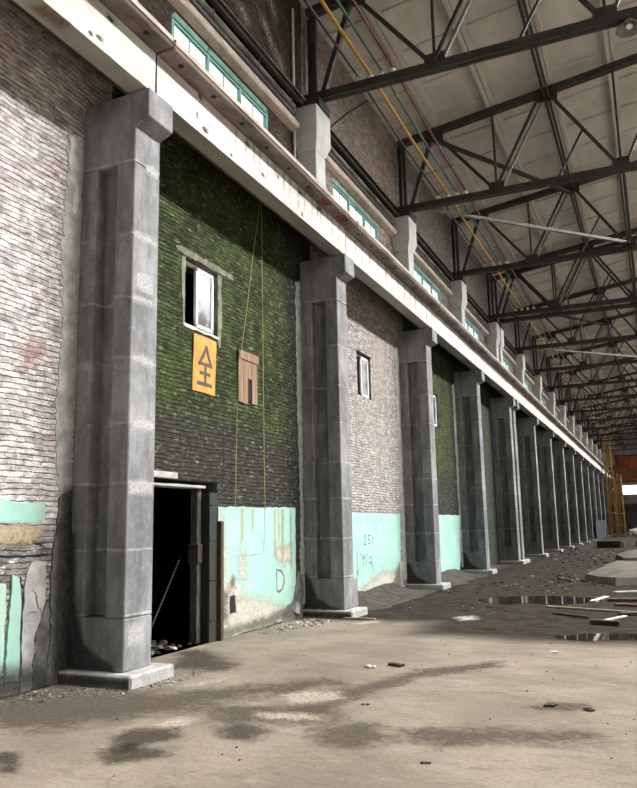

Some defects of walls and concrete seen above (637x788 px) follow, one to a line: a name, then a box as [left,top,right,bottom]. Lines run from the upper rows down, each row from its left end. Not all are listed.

peeling [220,281,305,632]
crack [0,540,52,558]
peeling [0,561,51,693]
crack [20,577,42,658]